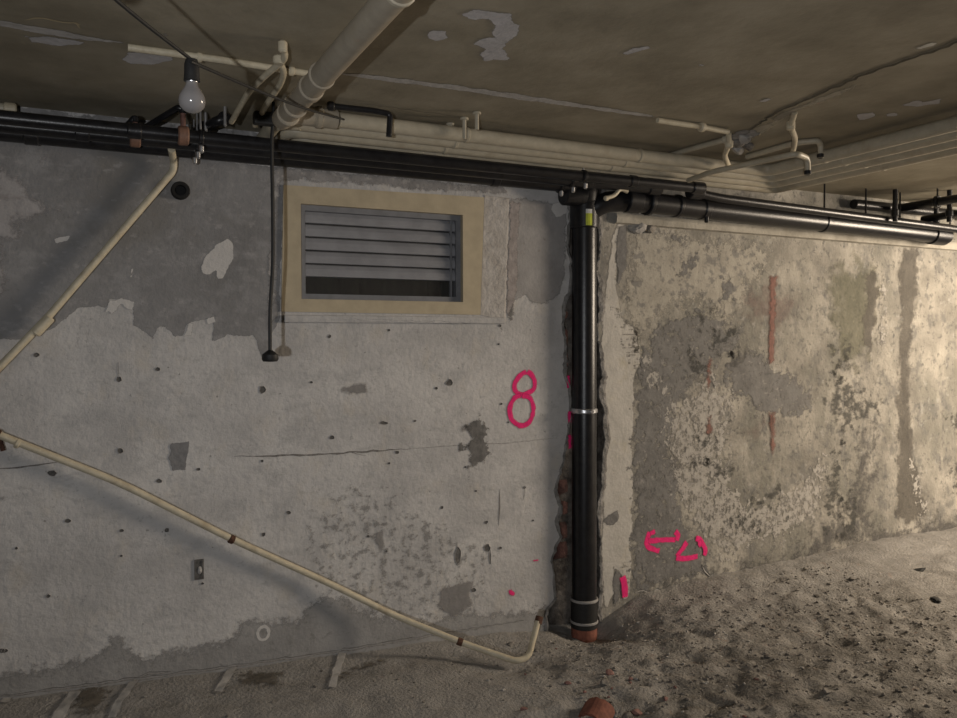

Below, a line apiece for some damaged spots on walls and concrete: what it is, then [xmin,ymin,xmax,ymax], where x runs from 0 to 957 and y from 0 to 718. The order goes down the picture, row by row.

peeling [462,10,520,61]
rust [769,276,778,364]
peeling [0,141,572,714]
crack [234,438,551,457]
peeling [597,217,833,622]
damp [785,248,957,560]
damp [328,652,346,687]